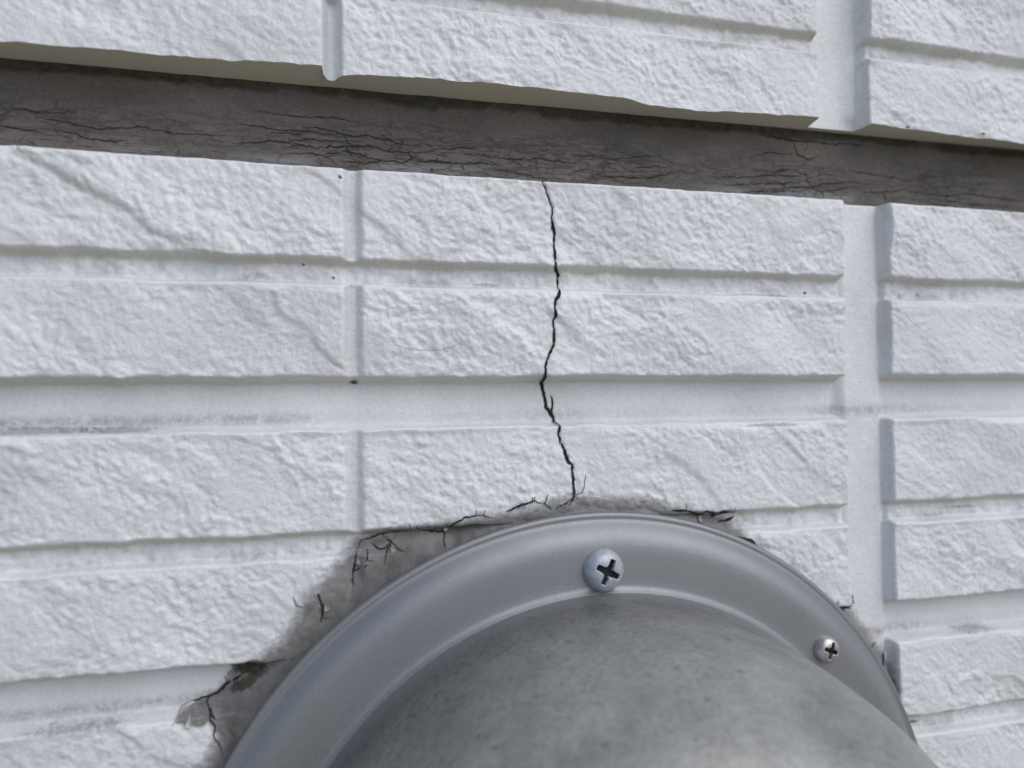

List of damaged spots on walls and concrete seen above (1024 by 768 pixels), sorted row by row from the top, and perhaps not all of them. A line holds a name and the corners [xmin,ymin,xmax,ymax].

crack [2,108,1023,585]
crack [292,594,331,622]
crack [193,670,244,754]